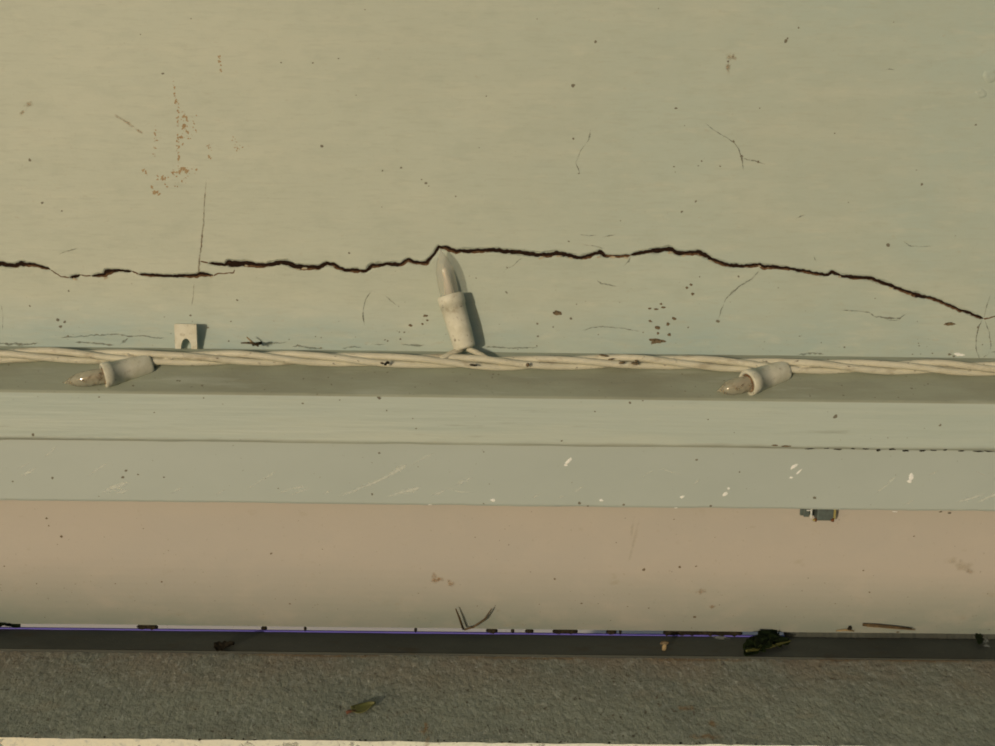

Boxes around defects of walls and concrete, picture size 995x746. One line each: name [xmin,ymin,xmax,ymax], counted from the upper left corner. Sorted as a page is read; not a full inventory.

crack [0,187,995,357]